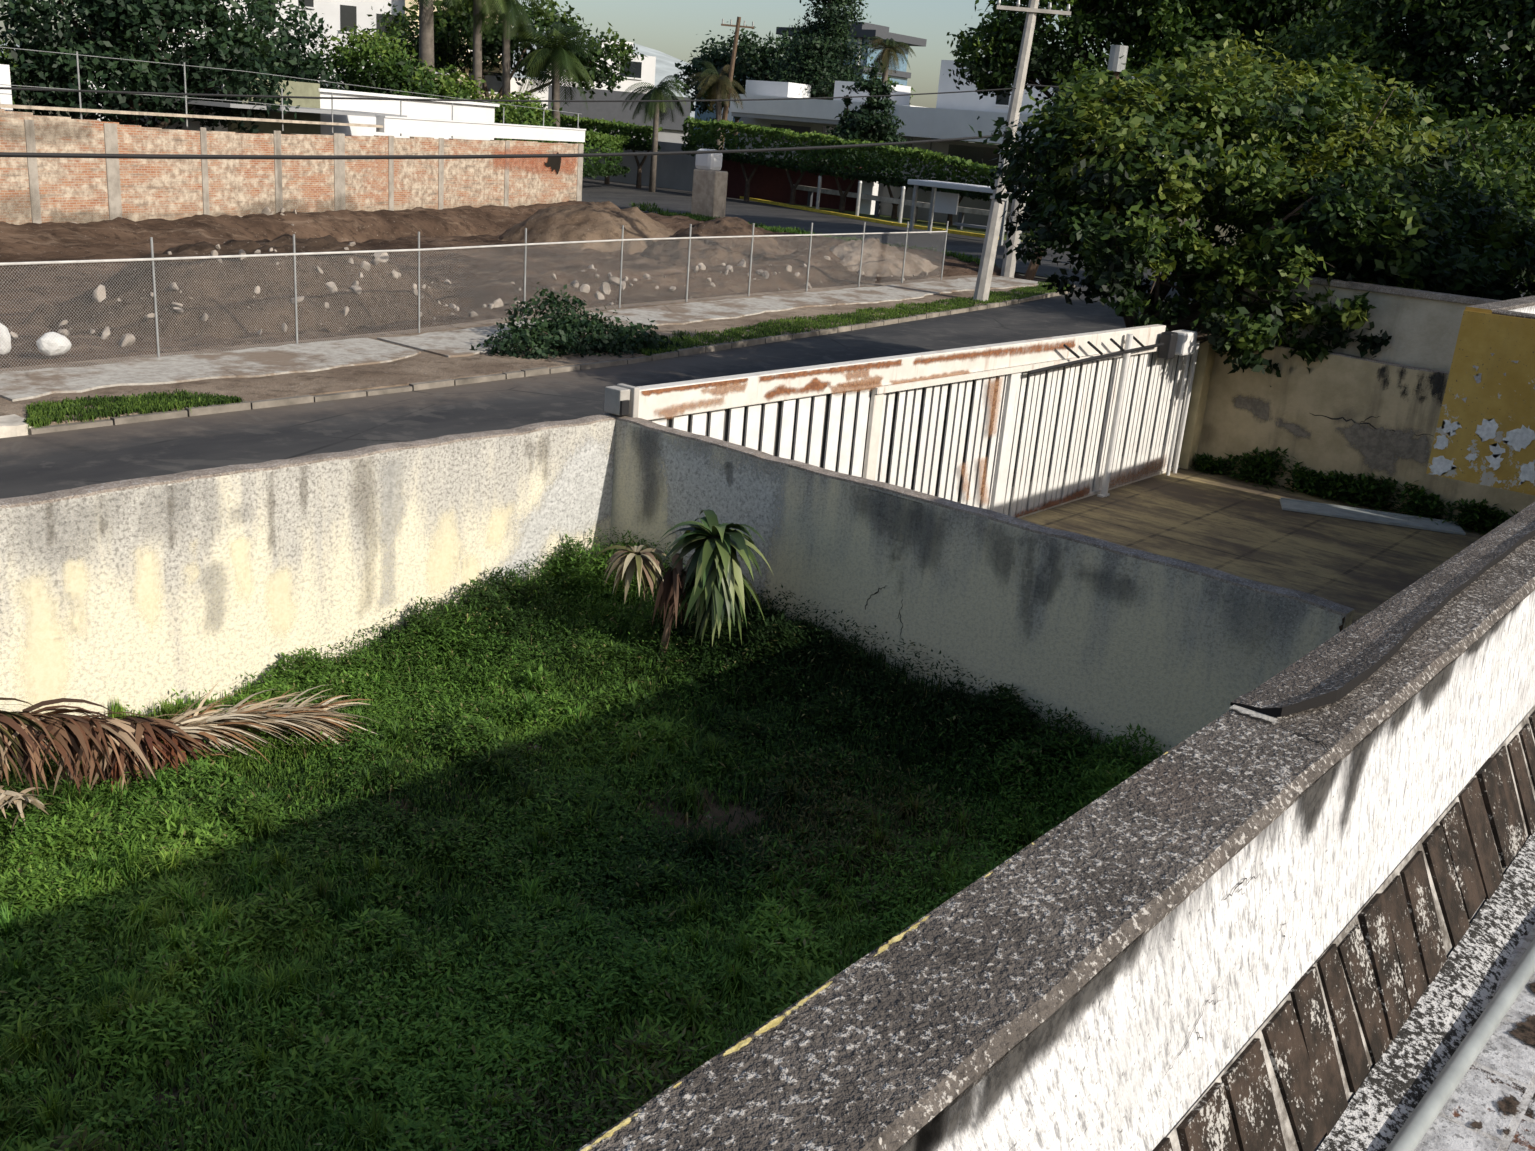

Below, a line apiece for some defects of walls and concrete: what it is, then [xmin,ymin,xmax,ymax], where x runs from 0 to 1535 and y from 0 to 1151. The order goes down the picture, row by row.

rust [642,341,1075,417]
rust [990,379,1002,433]
rust [962,459,988,503]
flaking render [1337,418,1535,486]
damp [429,516,478,591]
damp [23,562,87,714]
peeling [1508,1014,1535,1045]
peeling [1497,1094,1521,1135]